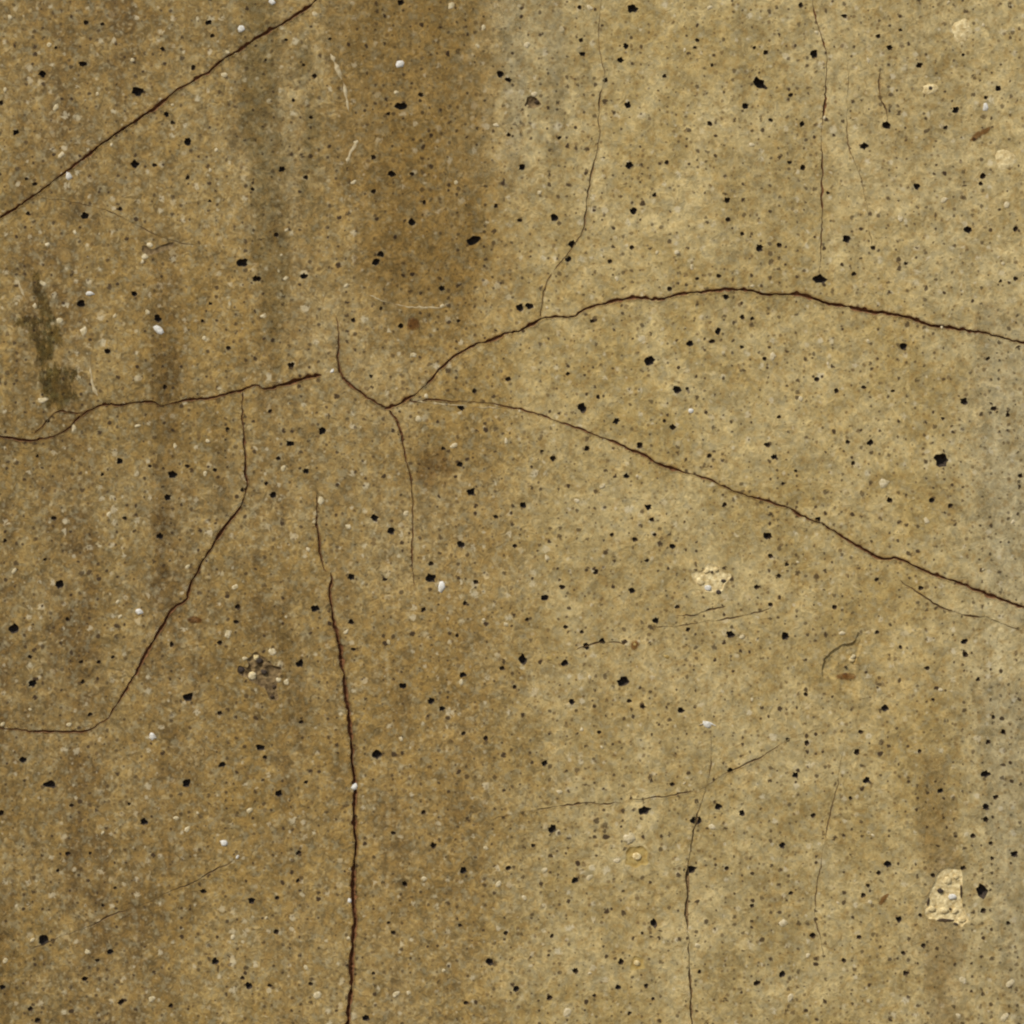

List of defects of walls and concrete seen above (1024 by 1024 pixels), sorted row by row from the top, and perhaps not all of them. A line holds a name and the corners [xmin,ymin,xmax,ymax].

leakage [15,271,98,409]
crack [0,0,1024,733]
crack [313,494,358,1024]